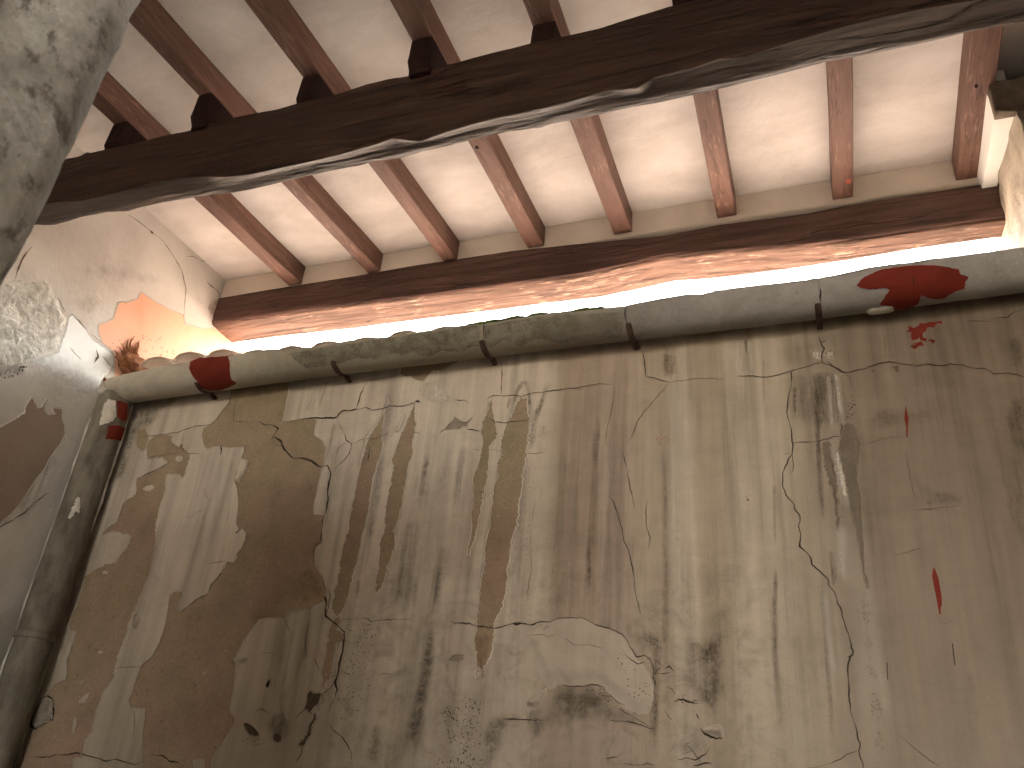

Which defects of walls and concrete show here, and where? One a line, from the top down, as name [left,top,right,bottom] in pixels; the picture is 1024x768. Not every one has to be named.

flaking render [0,395,66,525]
flaking render [20,428,190,768]
flaking render [97,292,248,377]
flaking render [128,382,418,768]
flaking render [444,397,534,679]
crack [412,351,716,614]
crack [450,500,722,766]
crack [743,339,1023,768]